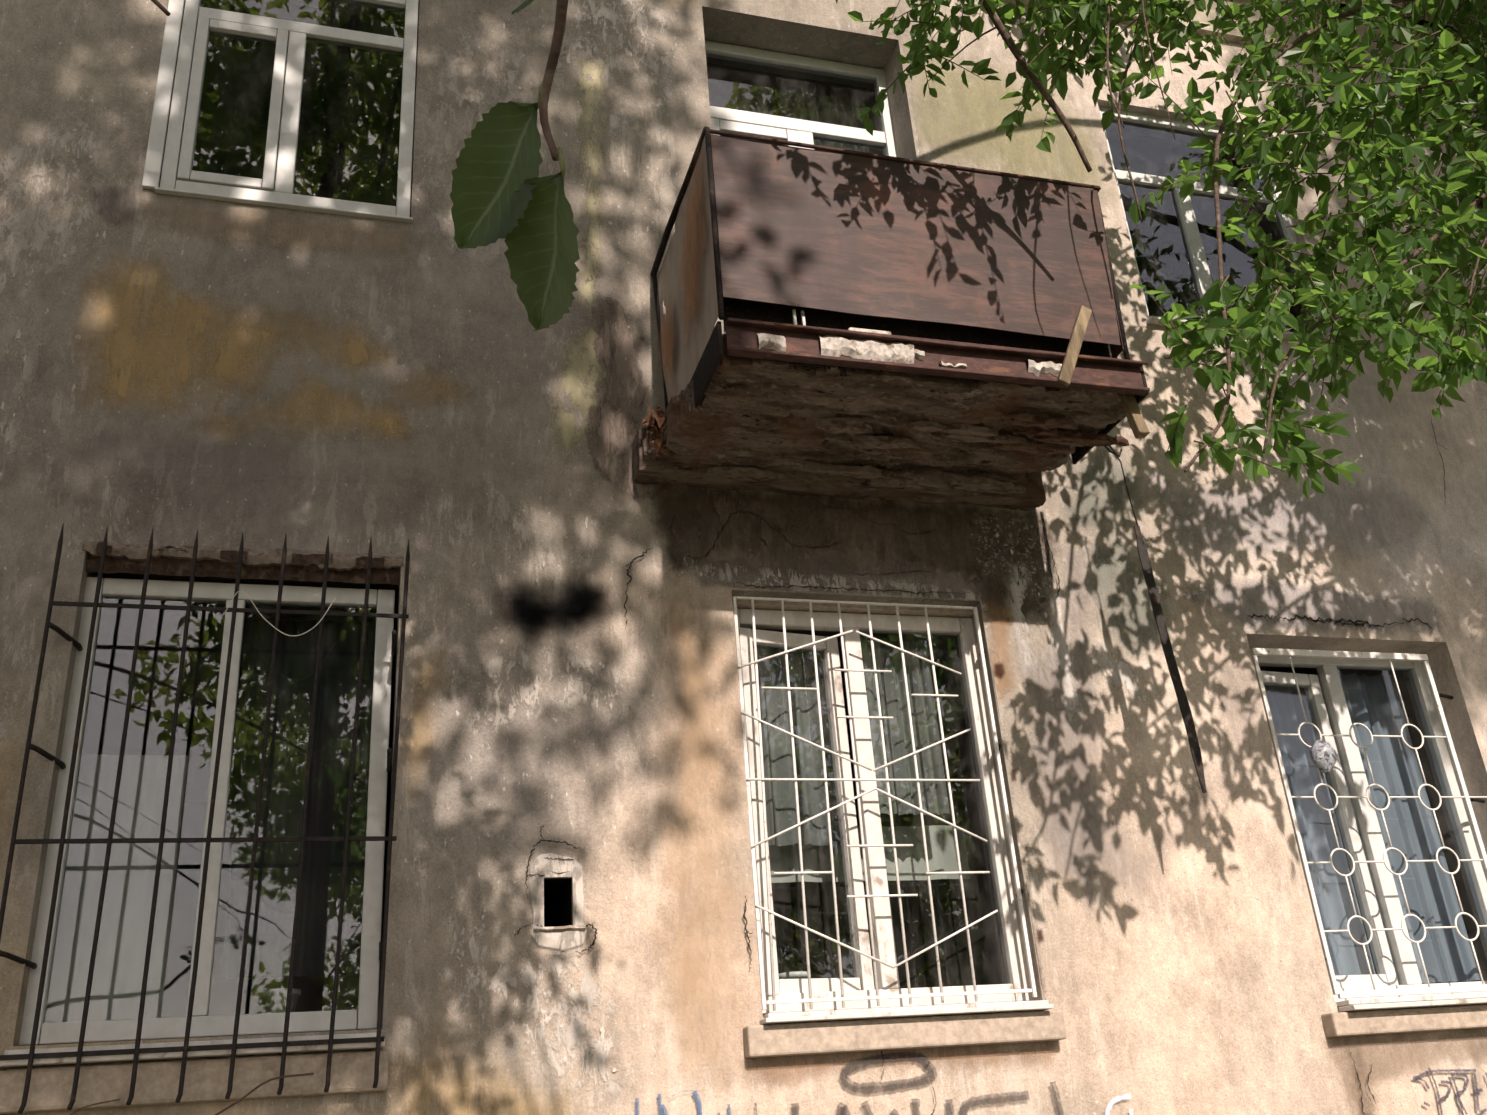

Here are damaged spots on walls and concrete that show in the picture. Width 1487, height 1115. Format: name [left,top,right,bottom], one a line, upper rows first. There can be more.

damp [99,267,271,399]
spalling [803,414,1129,494]
crack [624,496,980,625]
peeling [684,558,988,611]
damp [653,485,1076,718]
flaking render [969,512,1055,621]
crack [1248,614,1432,628]
damp [1097,645,1139,694]
crack [525,826,588,889]
crack [515,923,597,954]